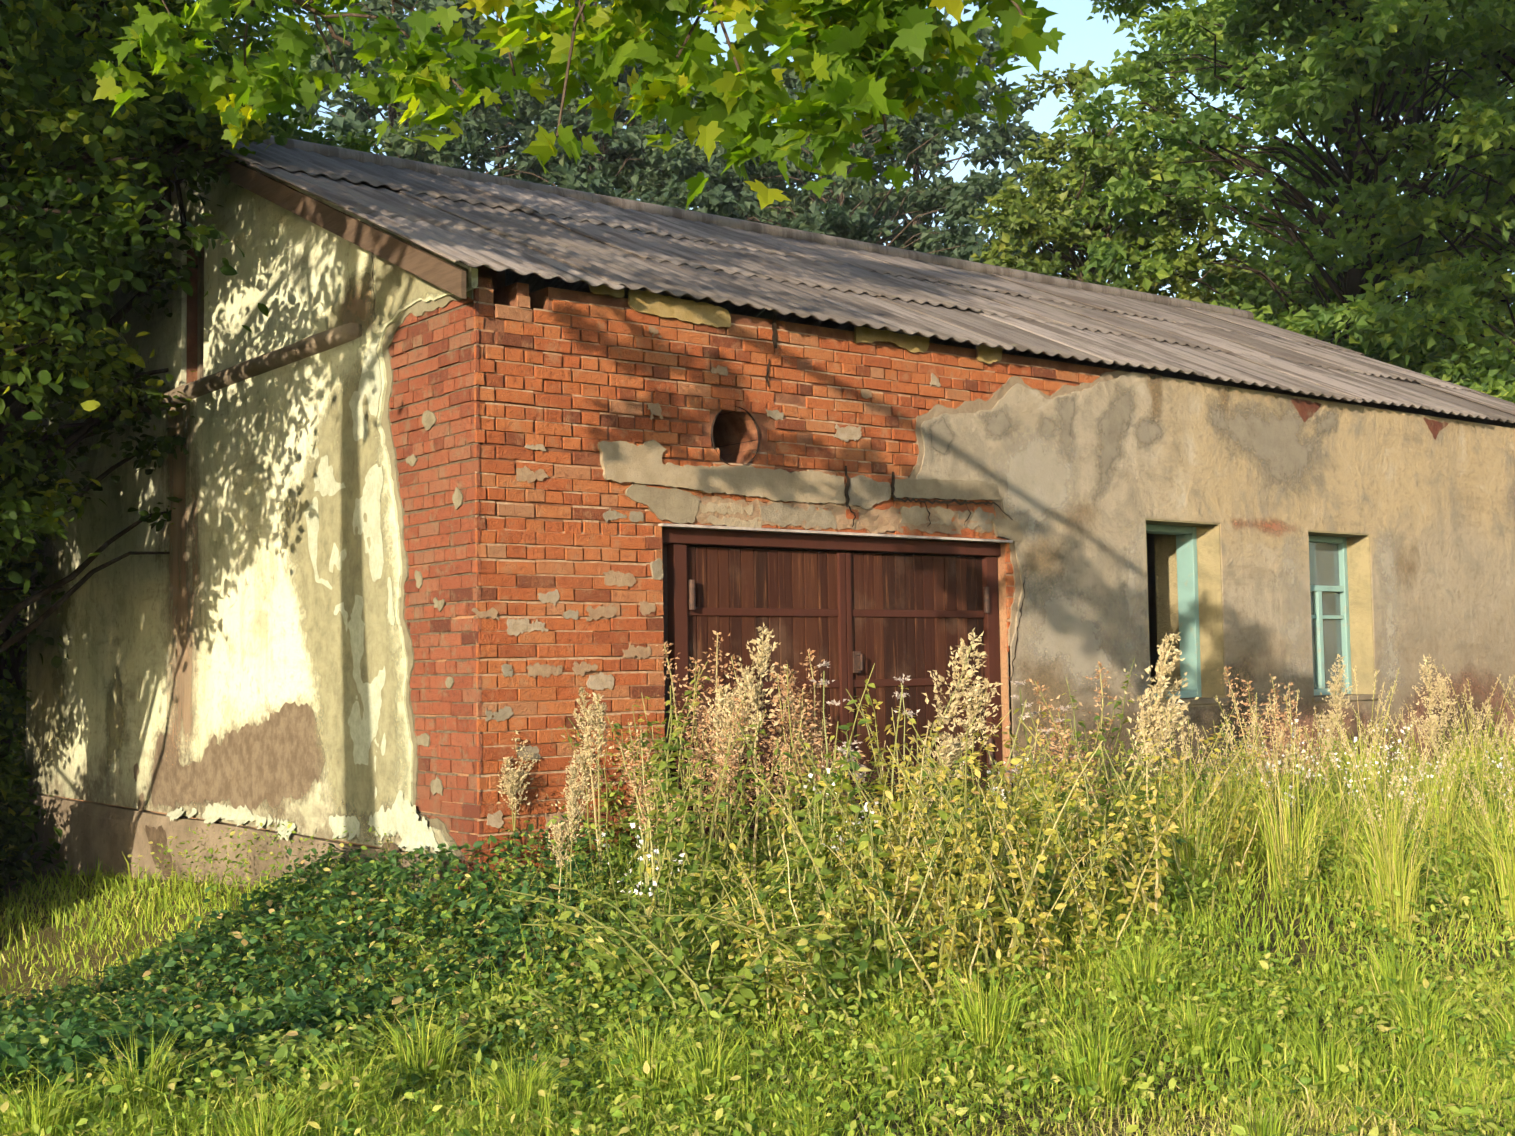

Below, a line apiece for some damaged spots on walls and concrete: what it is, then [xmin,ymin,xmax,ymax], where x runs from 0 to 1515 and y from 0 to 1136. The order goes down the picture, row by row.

water stain [22,533,70,783]
water stain [105,667,125,764]
flaking render [133,284,1100,893]